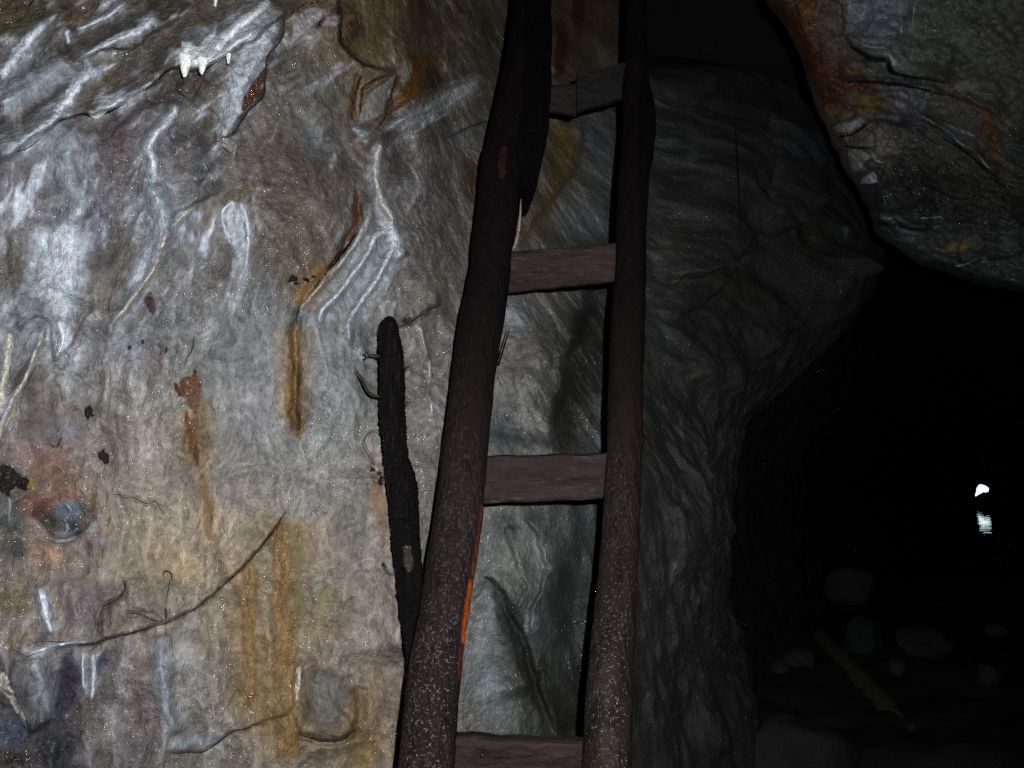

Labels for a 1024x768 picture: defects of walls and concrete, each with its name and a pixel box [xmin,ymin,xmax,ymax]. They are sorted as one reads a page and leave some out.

corrosion [174,370,204,464]
corrosion [285,325,301,437]